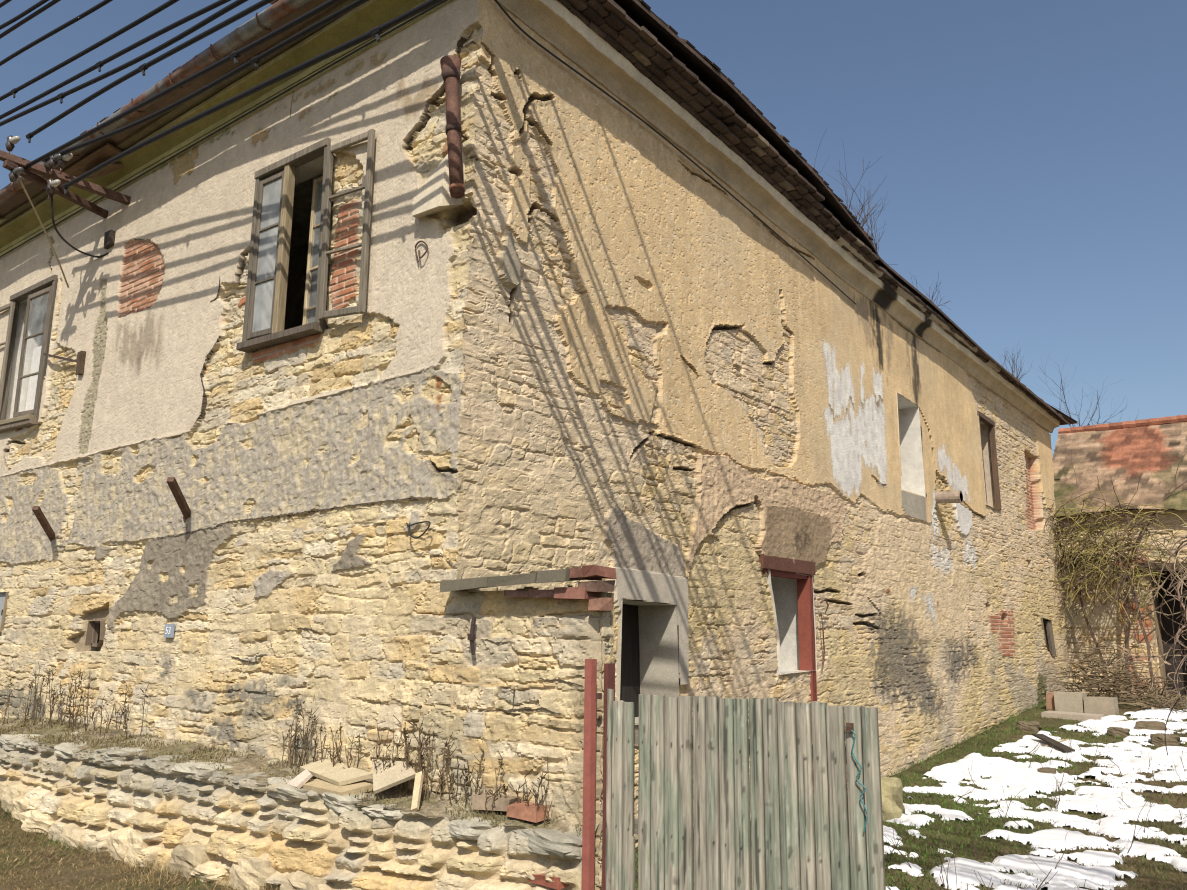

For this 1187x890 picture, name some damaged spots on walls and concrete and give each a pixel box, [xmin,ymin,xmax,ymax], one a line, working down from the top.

flaking render [120,238,165,318]
peeling [188,150,400,482]
spalling [386,22,483,469]
spalling [634,276,654,291]
peeling [8,277,139,543]
spalling [600,380,631,411]
spalling [605,304,669,422]
spalling [704,289,801,468]
peeling [136,465,156,482]
spalling [712,496,766,549]
crack [718,495,762,522]
flaking render [988,609,1016,657]